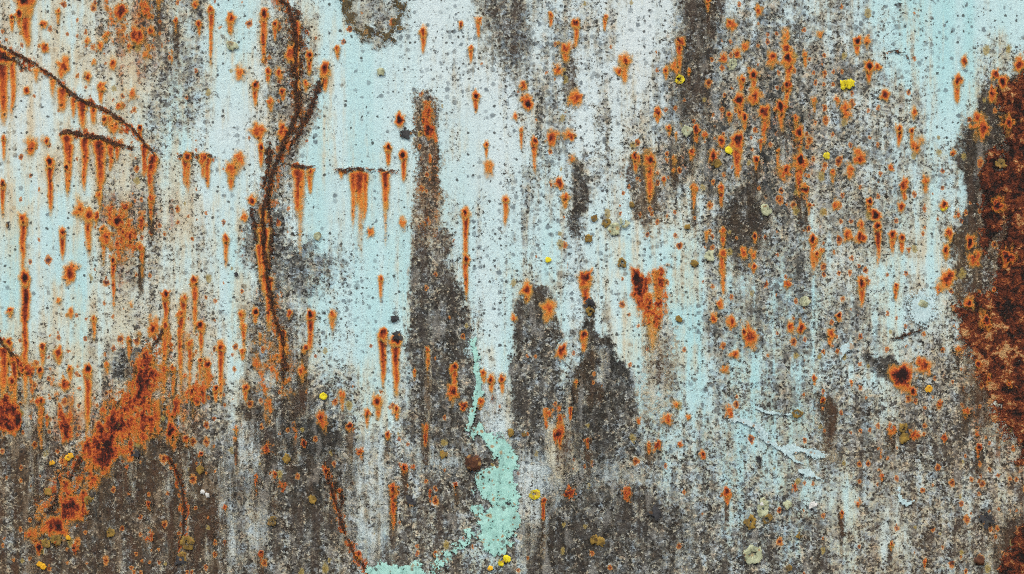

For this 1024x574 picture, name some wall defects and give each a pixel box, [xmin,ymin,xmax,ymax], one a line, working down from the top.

corrosion [83,0,180,135]
corrosion [235,2,340,111]
corrosion [614,52,632,82]
corrosion [852,35,882,82]
corrosion [249,121,288,167]
corrosion [513,80,576,170]
water stain [0,15,696,574]
corrosion [630,28,824,373]
corrosion [843,197,905,262]
corrosion [935,45,1024,483]
corrosion [0,212,227,569]
corrosion [446,362,506,411]